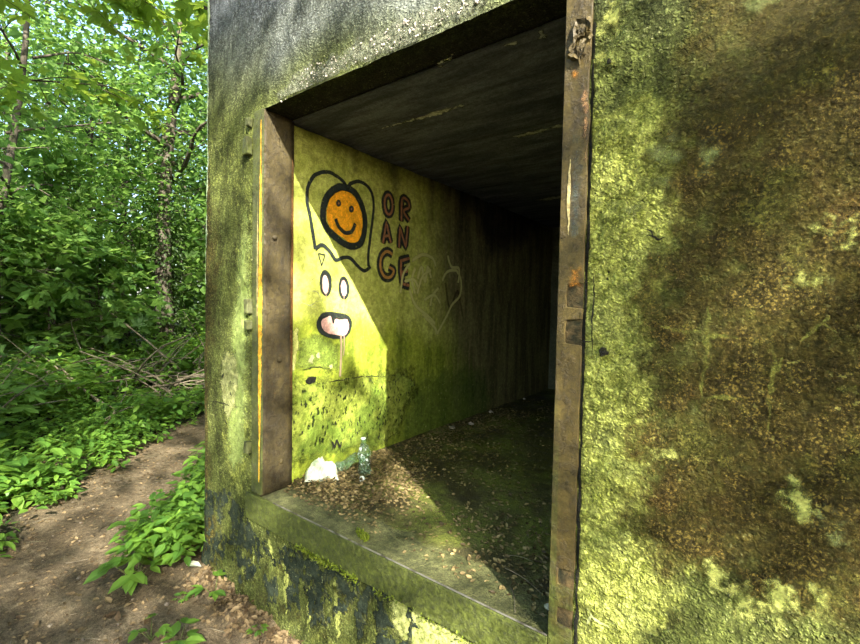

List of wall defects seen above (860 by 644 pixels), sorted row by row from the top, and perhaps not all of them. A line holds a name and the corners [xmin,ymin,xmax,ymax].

damp [622,33,860,618]
damp [268,538,289,614]
damp [333,576,341,639]
damp [391,598,474,644]